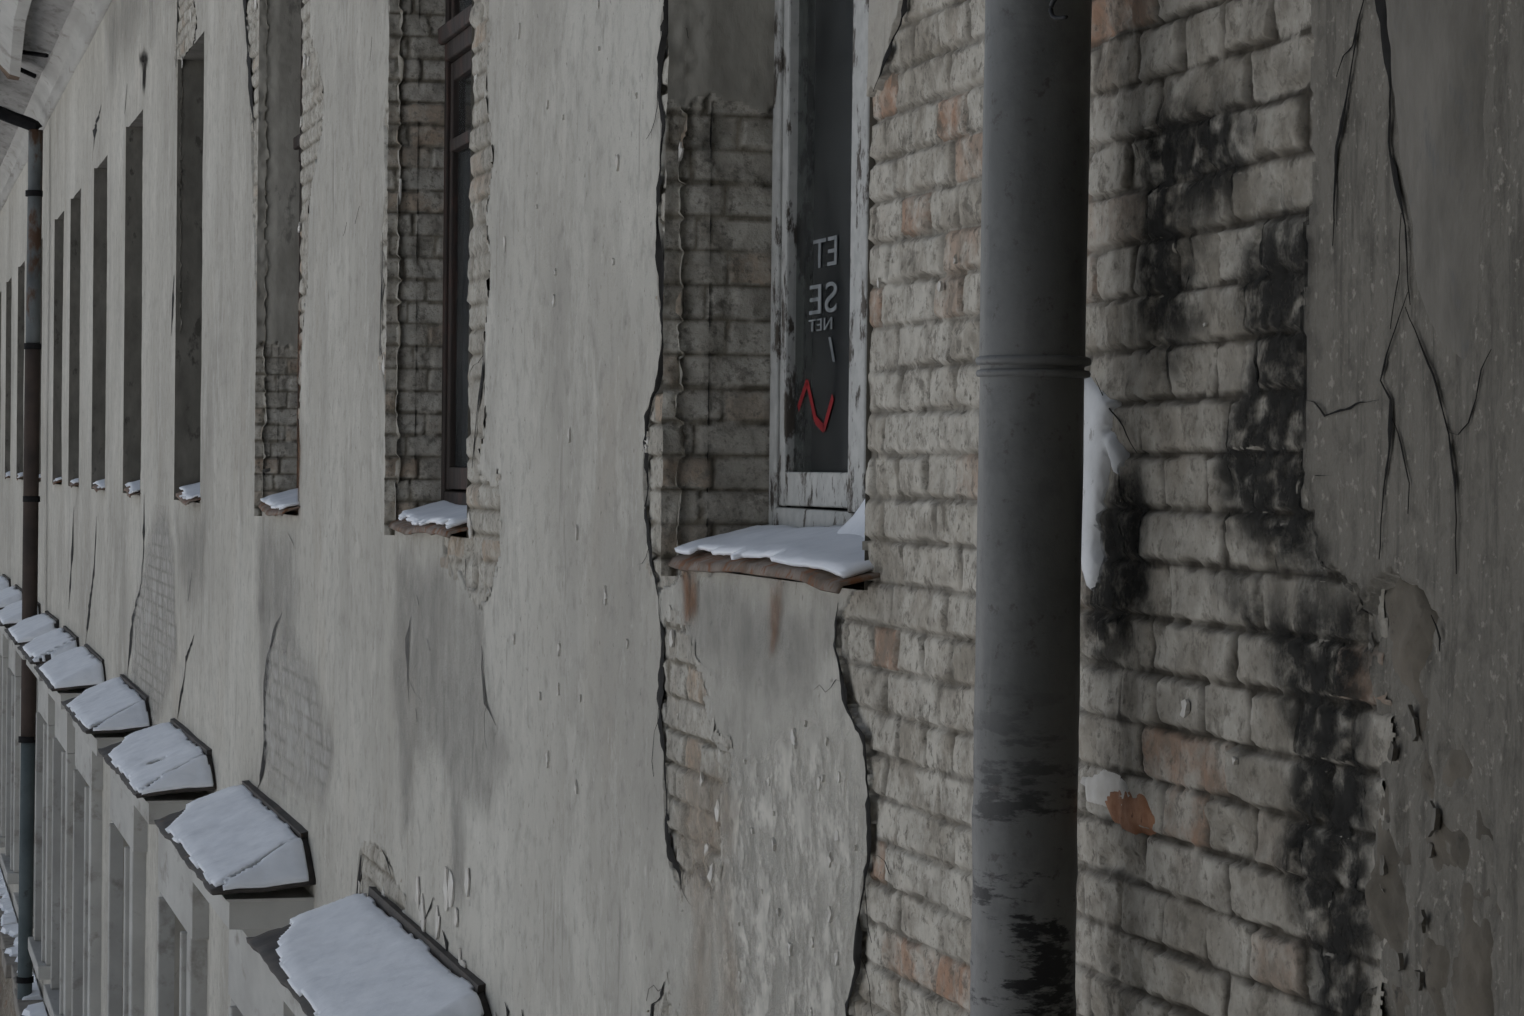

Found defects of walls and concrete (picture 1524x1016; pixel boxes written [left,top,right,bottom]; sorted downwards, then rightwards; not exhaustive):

flaking render [246,0,270,476]
flaking render [298,0,324,419]
flaking render [377,5,404,487]
flaking render [440,0,506,610]
flaking render [642,35,711,588]
flaking render [658,0,985,1016]
flaking render [1075,0,1501,1016]
crack [1303,0,1492,574]
crack [1431,615,1441,652]